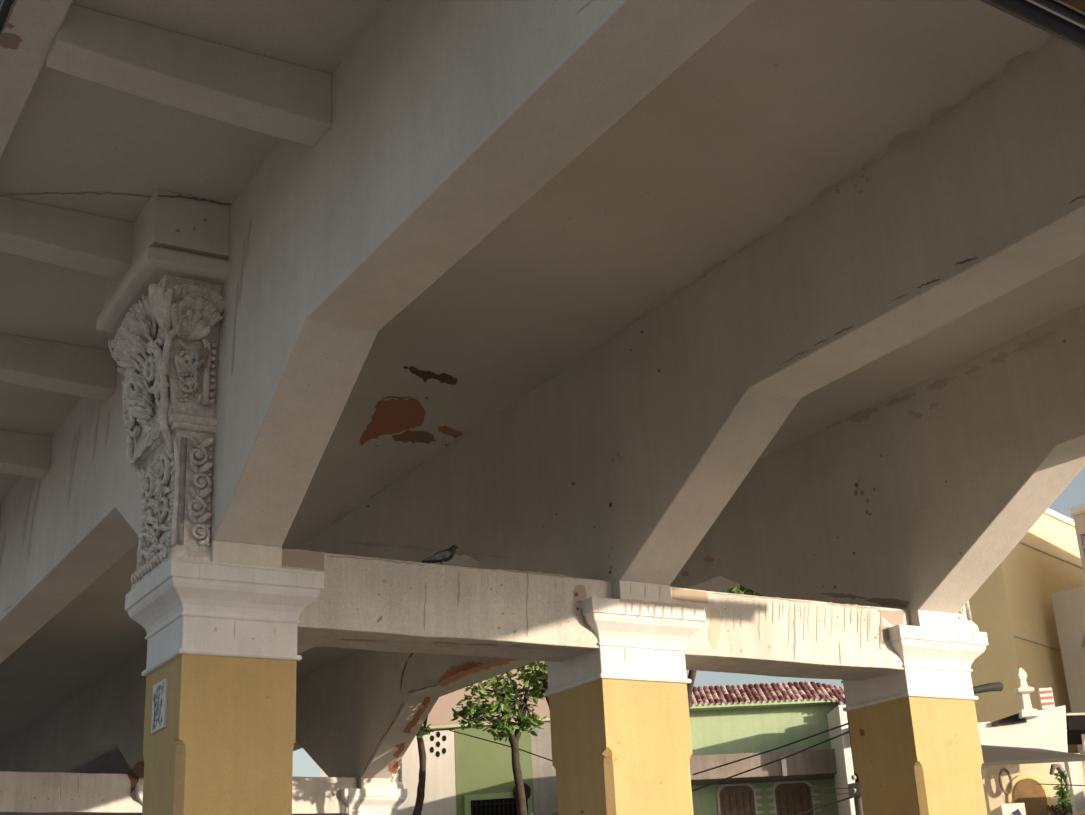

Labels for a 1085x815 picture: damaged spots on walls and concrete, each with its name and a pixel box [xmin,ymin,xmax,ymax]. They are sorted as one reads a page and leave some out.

crack [0,192,232,205]
peeling [403,366,457,385]
peeling [360,397,463,446]
damp [713,592,877,650]
crack [362,584,438,774]
spalling [438,658,518,687]
spalling [389,697,431,774]